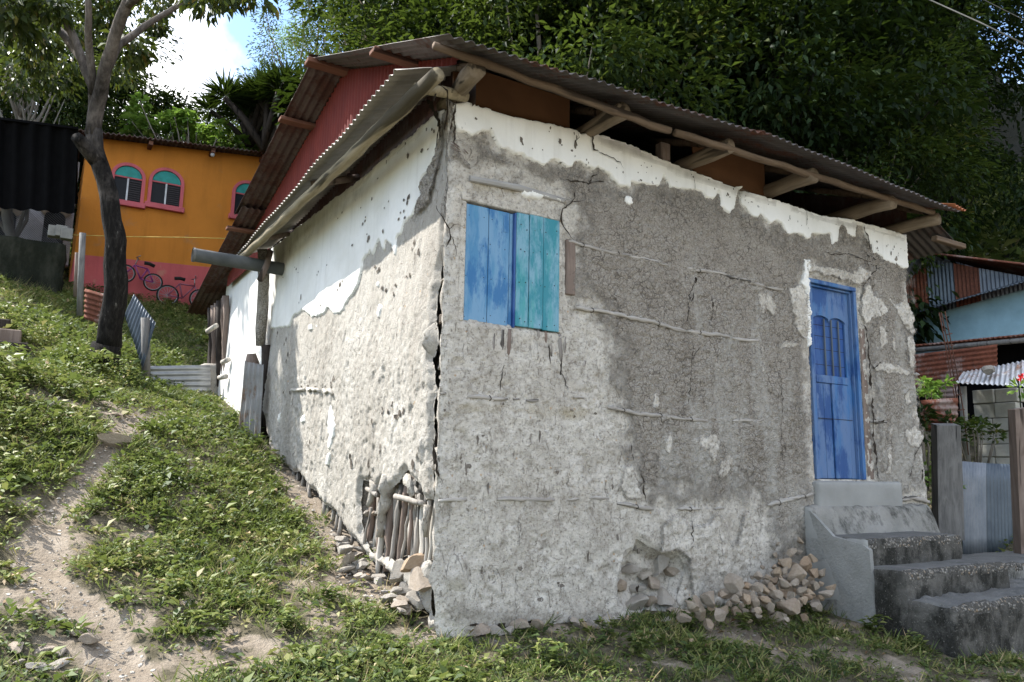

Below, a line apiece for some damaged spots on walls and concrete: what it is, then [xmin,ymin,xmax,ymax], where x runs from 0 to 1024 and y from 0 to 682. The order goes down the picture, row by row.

crack [436,206,459,254]
crack [560,134,623,237]
spalling [268,102,927,615]
crack [861,324,885,475]
crack [429,440,443,482]